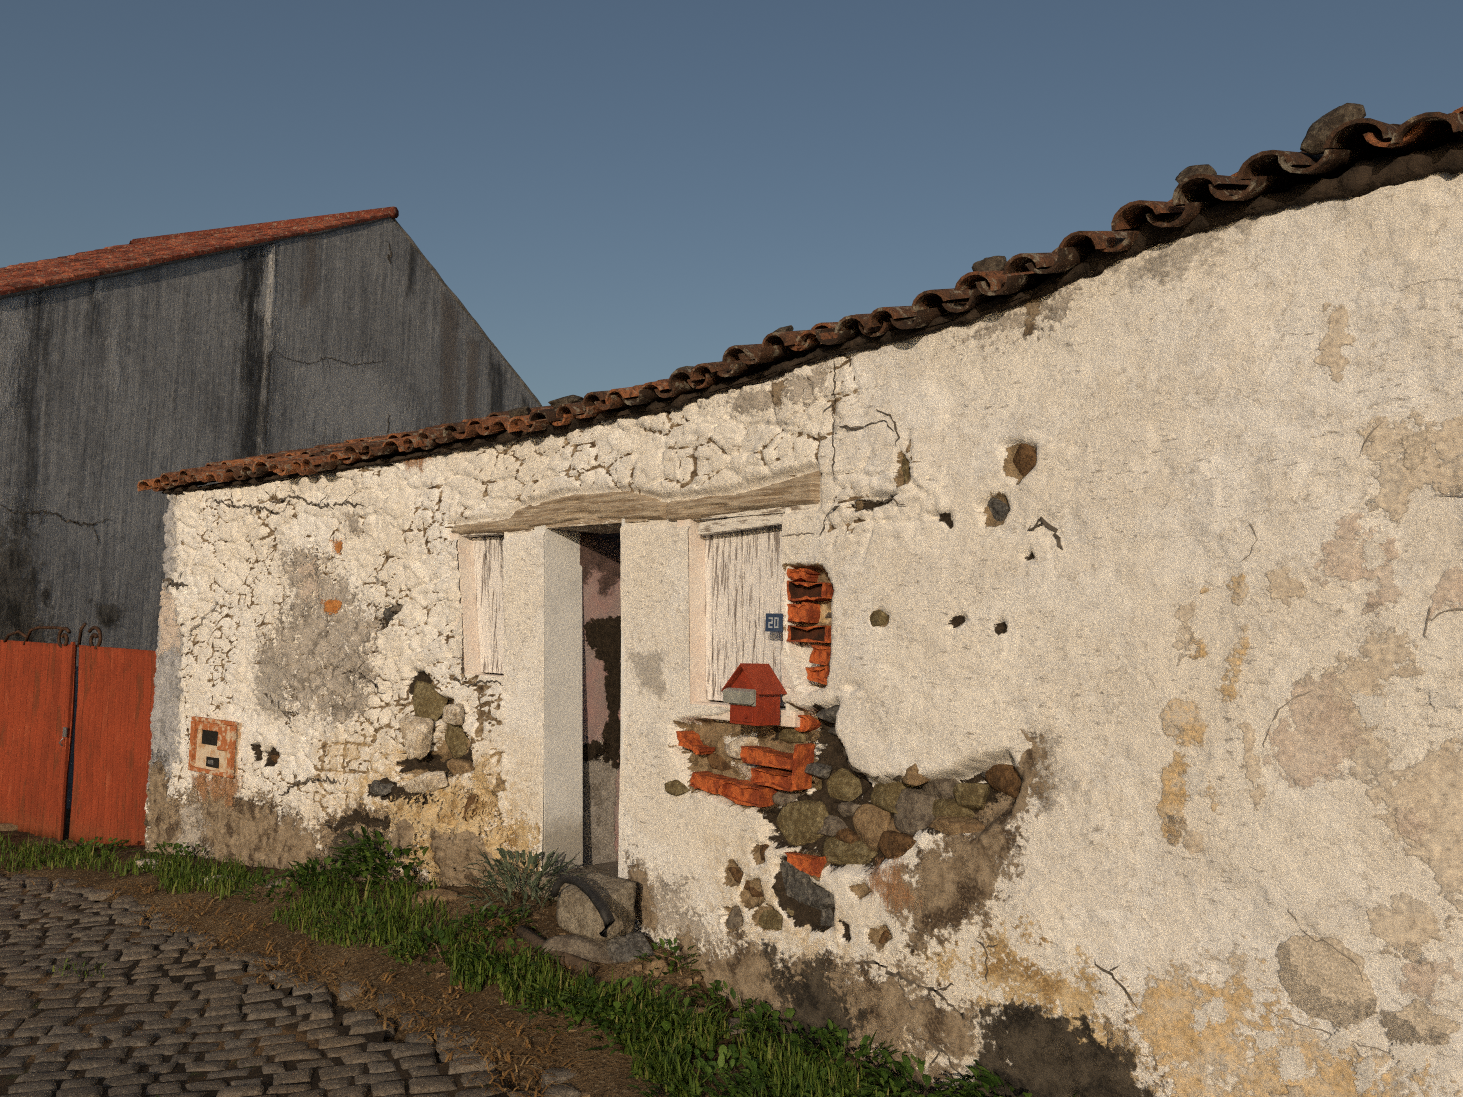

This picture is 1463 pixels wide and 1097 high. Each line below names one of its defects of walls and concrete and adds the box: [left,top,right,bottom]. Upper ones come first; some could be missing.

leakage [0,291,65,643]
leakage [233,244,425,459]
leakage [488,361,505,413]
peeling [1310,302,1356,382]
leakage [89,599,126,629]
leakage [290,538,342,615]
leakage [144,587,541,895]
spalling [367,670,482,821]
spalling [664,563,1022,950]
peeling [1106,409,1463,1097]
leakage [622,839,1154,1097]
leakage [868,808,1003,944]